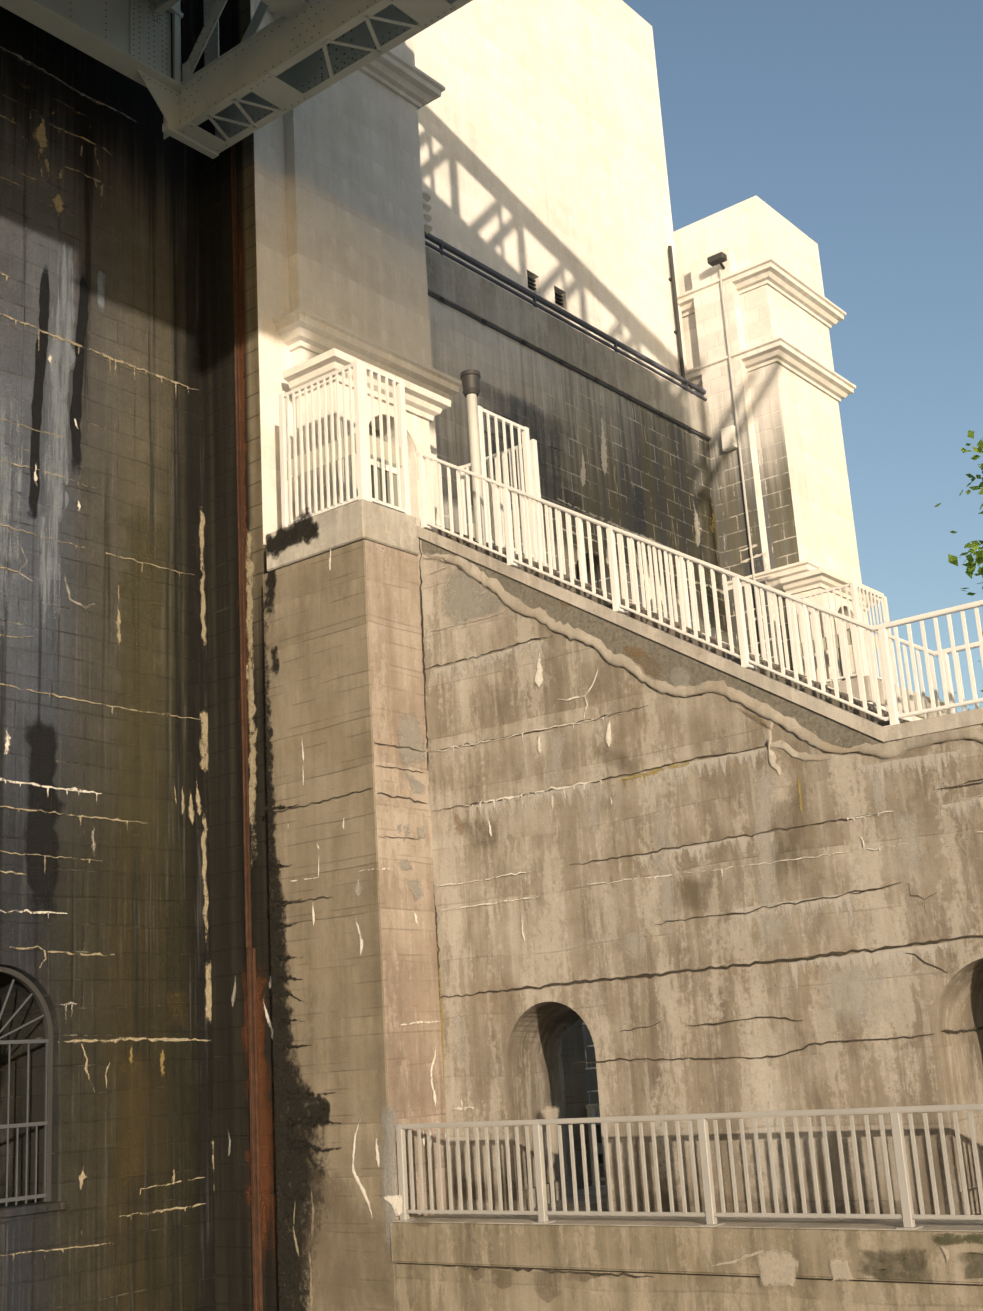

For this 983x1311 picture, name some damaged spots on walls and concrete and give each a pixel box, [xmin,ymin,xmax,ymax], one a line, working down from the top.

water stain [0,114,207,645]
water stain [494,394,724,633]
water stain [0,721,144,916]
water stain [0,683,208,770]
water stain [65,1037,210,1075]
water stain [174,785,209,939]
rust [242,975,277,1250]
water stain [245,508,403,1311]
crack [275,537,769,812]
crack [433,882,983,1041]
crack [570,813,880,865]
crack [574,1016,983,1064]